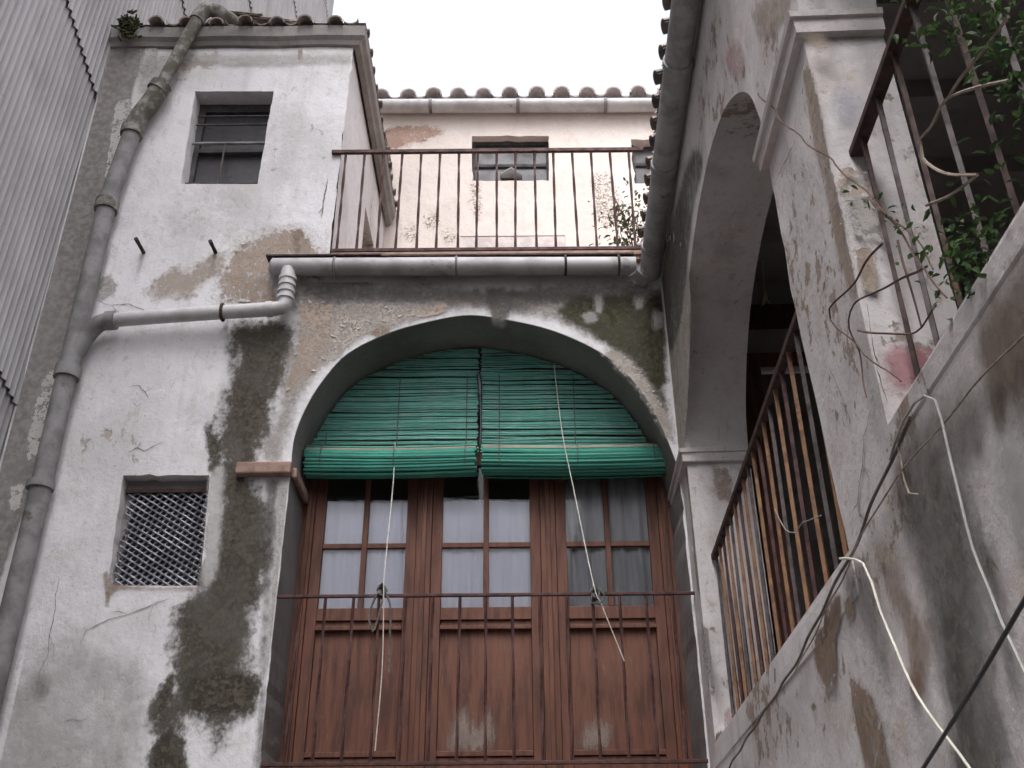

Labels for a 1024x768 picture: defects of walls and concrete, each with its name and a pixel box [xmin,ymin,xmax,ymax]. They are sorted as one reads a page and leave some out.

peeling [384,125,443,149]
peeling [150,228,319,303]
damp [316,152,702,385]
damp [205,424,220,475]
damp [264,481,276,586]
crack [35,581,59,694]
crack [81,597,170,641]
damp [149,674,174,719]
damp [187,673,262,713]
peeling [811,595,890,768]
damp [148,730,187,768]